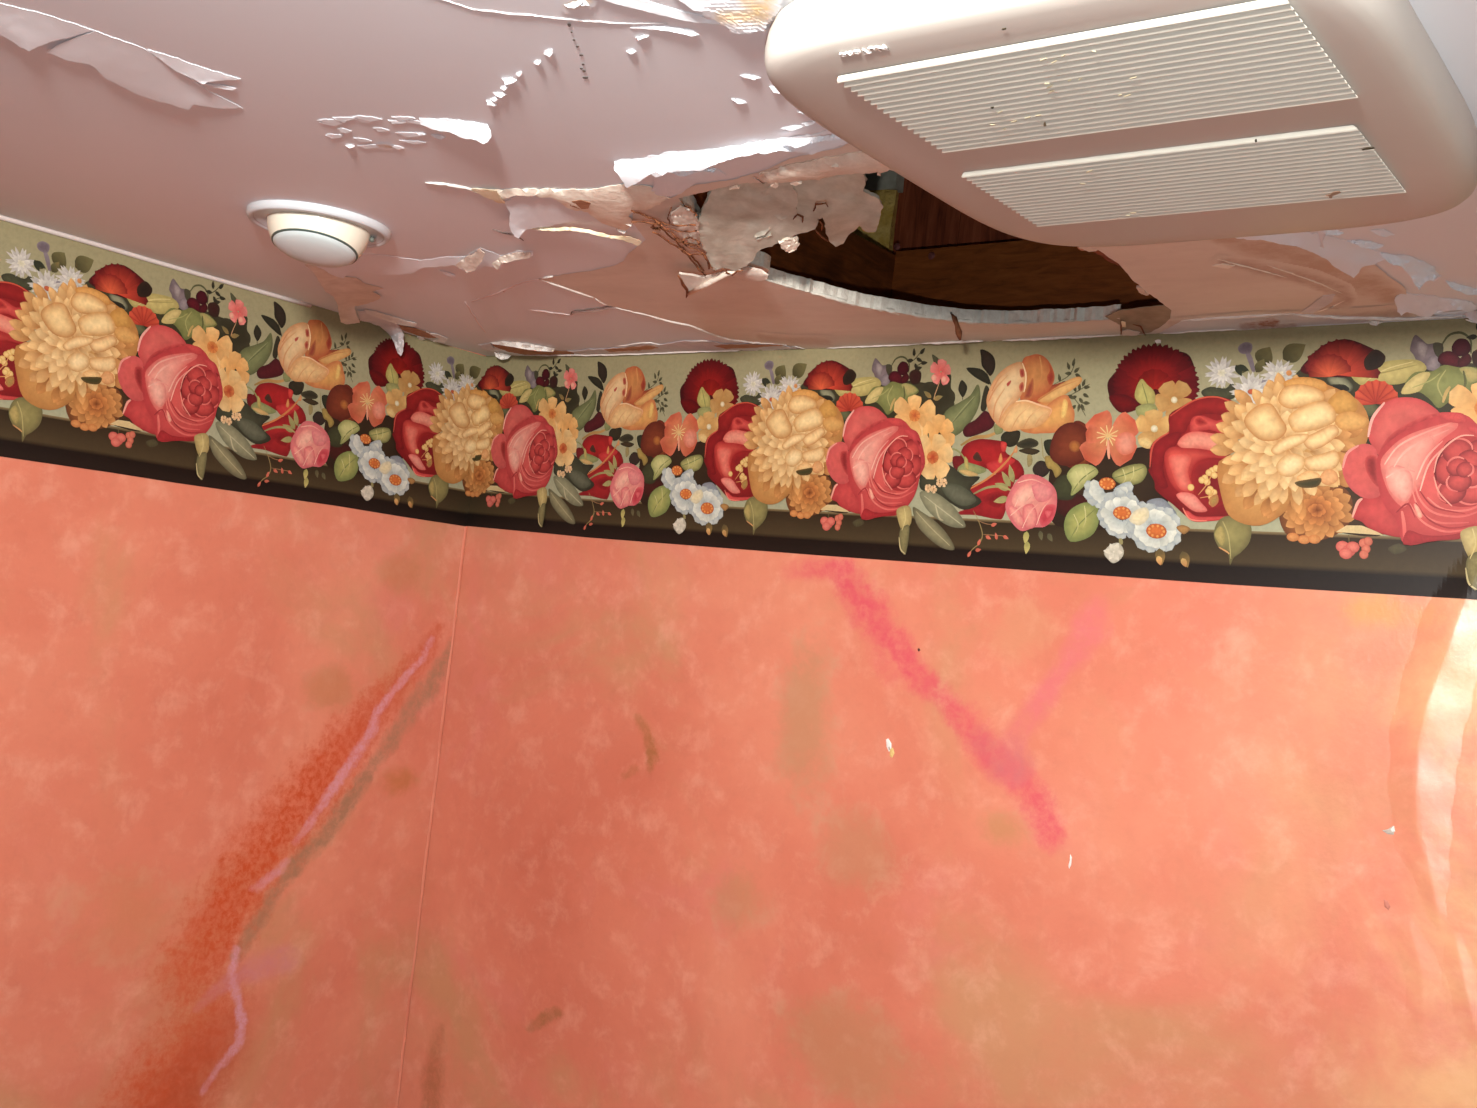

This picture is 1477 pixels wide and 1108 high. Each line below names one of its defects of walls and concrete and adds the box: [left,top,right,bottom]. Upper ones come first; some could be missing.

peeling [0,3,242,110]
peeling [419,118,491,144]
peeling [316,130,1477,349]